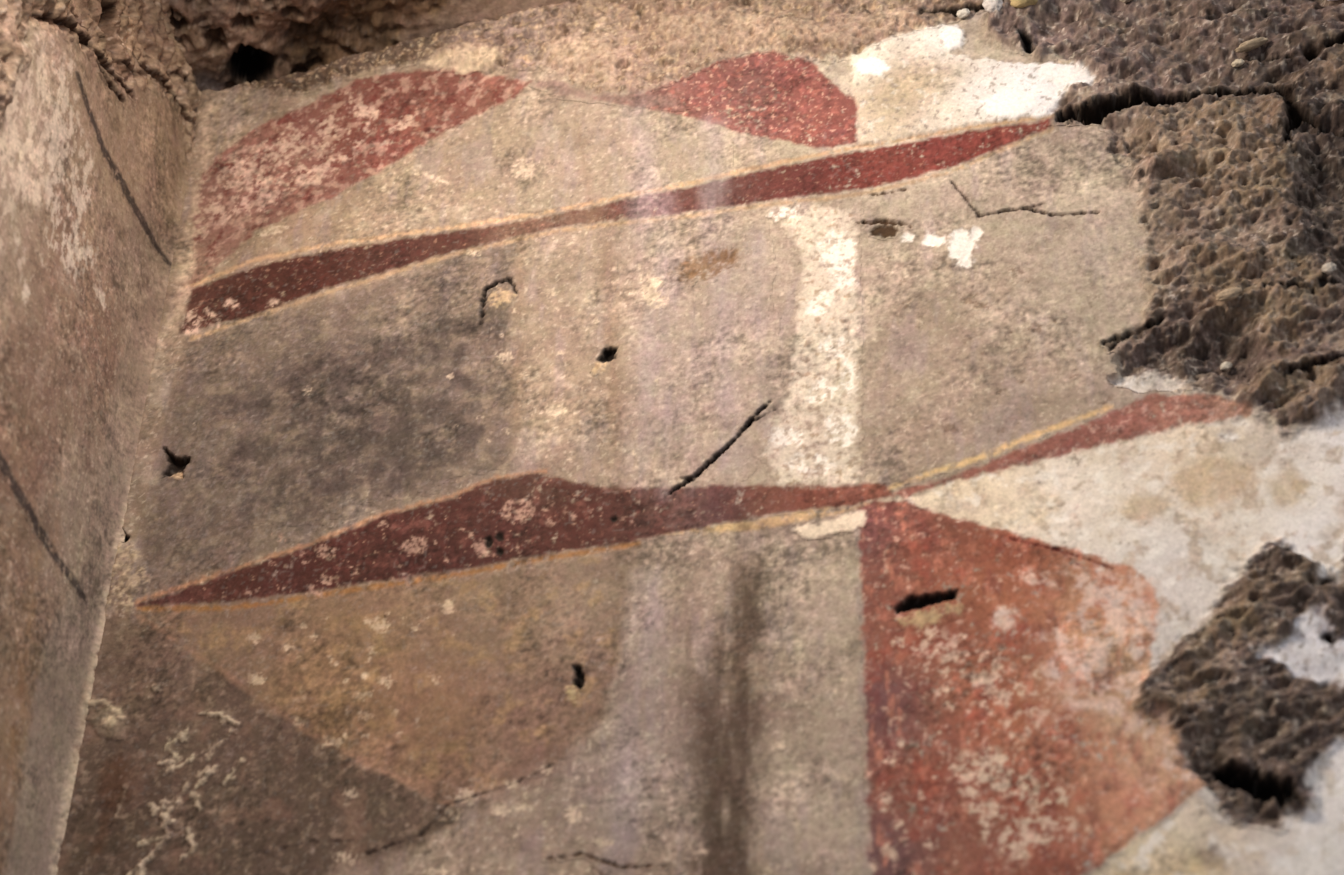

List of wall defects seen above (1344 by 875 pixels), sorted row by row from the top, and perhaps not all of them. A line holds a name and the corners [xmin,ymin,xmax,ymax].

flaking render [0,0,263,319]
peeling [397,495,596,570]
peeling [486,285,532,381]
water stain [567,105,794,507]
water stain [594,505,783,875]
crack [661,398,778,499]
spalling [195,0,1344,361]
peeling [760,204,869,493]
peeling [790,508,869,540]
crack [948,178,1101,219]
peeling [889,359,1344,875]
crack [1051,29,1344,147]